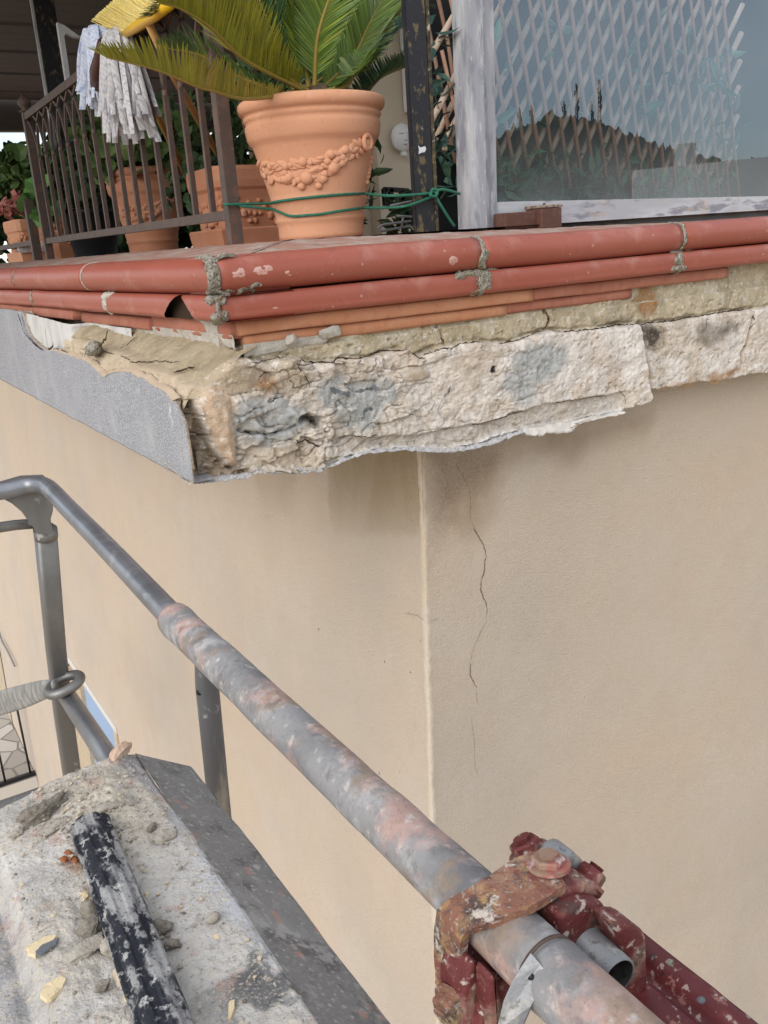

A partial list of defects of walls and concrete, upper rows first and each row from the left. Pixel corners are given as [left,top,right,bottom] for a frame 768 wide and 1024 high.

spalling [26,262,768,485]
crack [251,308,755,394]